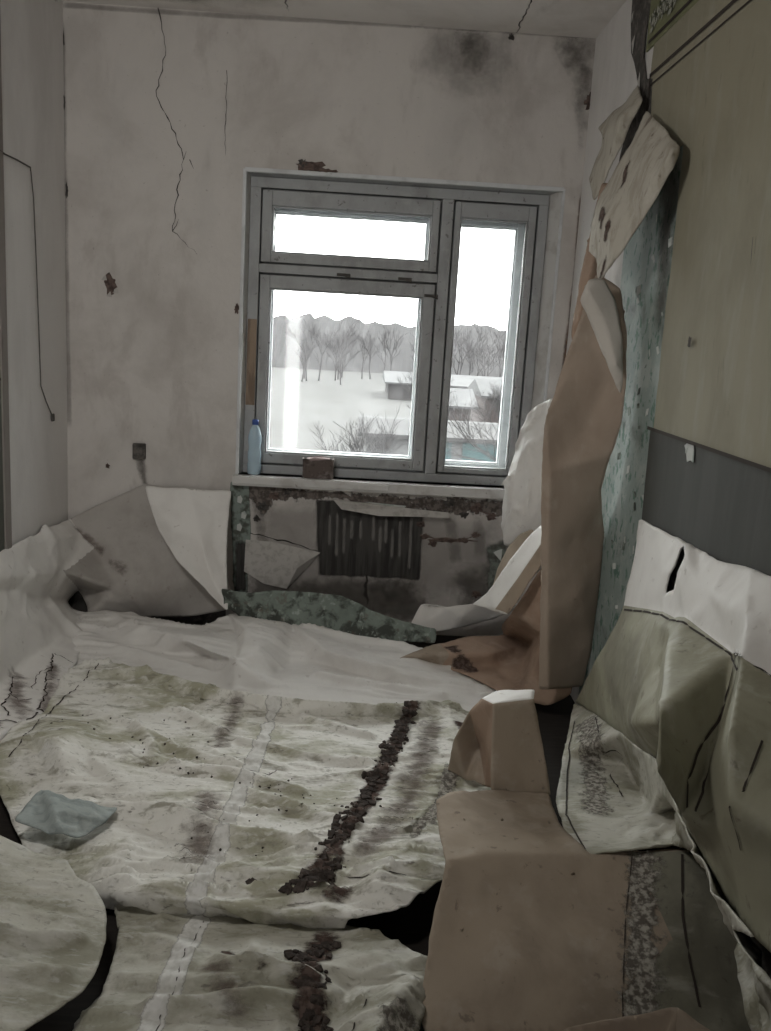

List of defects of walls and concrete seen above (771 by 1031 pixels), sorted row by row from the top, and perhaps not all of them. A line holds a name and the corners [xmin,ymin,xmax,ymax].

crack [156,8,197,254]
spalling [230,159,566,598]
peeling [578,145,684,706]